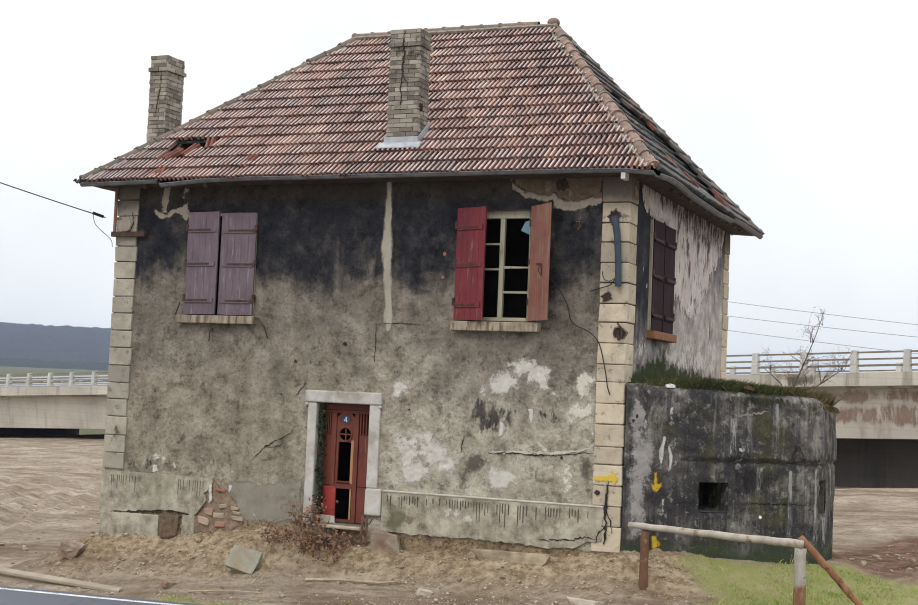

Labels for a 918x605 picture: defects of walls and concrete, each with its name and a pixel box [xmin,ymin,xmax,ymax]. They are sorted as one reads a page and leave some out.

peeling [155,187,189,221]
flaking render [511,177,604,230]
leakage [381,182,393,332]
peeling [642,185,725,321]
leakage [480,358,556,396]
crack [489,441,593,459]
leakage [627,396,673,539]
leakage [730,419,745,454]
spalling [158,513,180,539]
spalling [194,481,244,533]
leakage [743,468,792,521]
leakage [814,469,831,540]